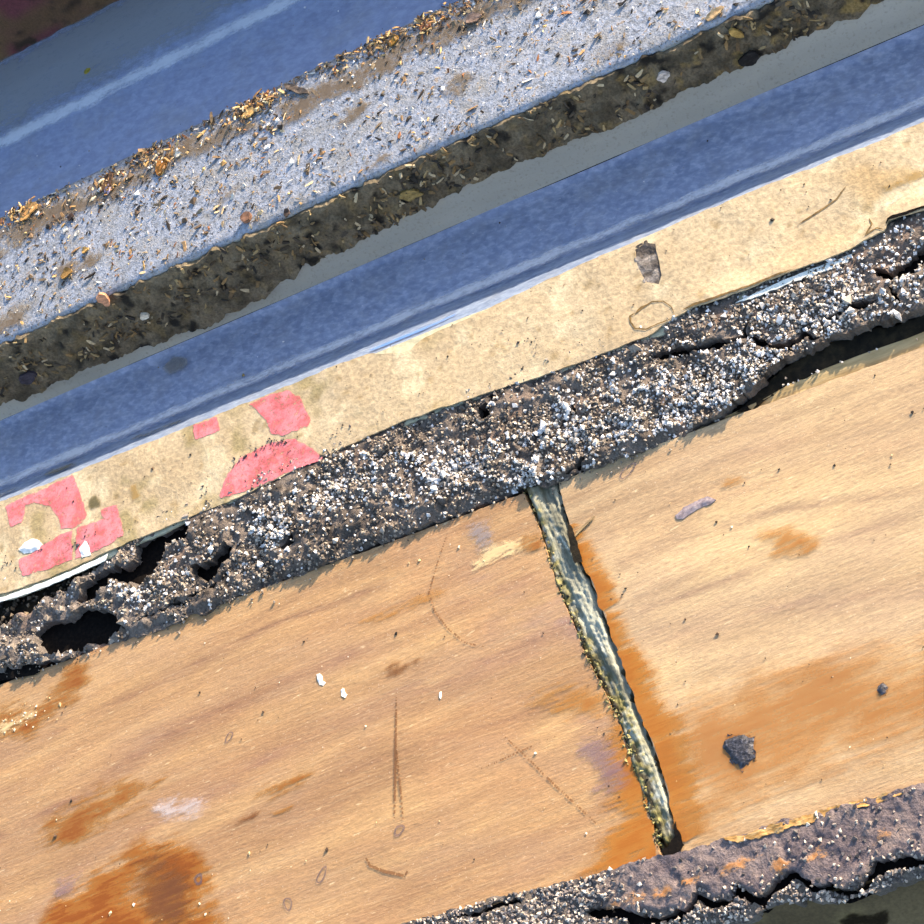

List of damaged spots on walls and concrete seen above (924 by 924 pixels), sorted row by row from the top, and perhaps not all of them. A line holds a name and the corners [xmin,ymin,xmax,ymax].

crack [799,188,845,224]
crack [878,255,924,304]
crack [660,334,814,360]
water stain [40,841,224,924]